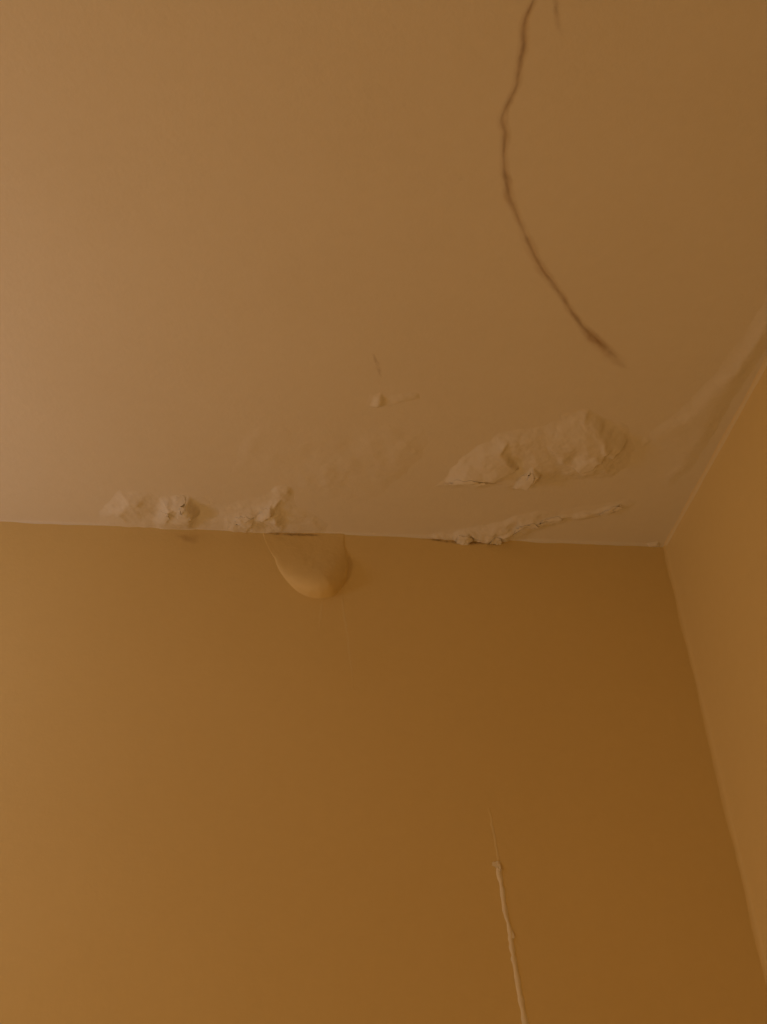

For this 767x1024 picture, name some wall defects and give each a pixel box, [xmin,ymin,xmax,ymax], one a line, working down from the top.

spalling [99,485,328,533]
peeling [429,498,636,545]
crack [488,807,529,1024]